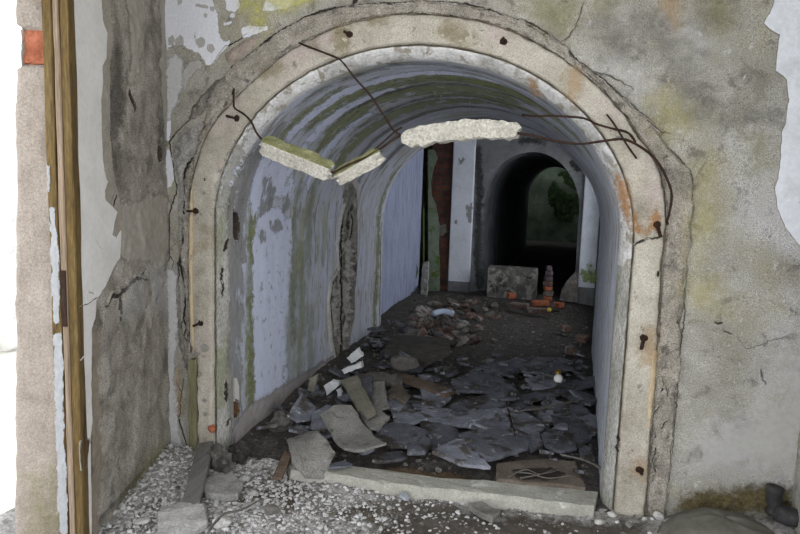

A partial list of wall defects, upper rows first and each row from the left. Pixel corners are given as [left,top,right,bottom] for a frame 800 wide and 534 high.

peeling [262,0,291,11]
peeling [155,0,268,250]
water stain [279,64,592,169]
crack [210,0,694,201]
crack [81,118,205,342]
peeling [228,145,290,444]
water stain [373,166,401,327]
water stain [473,146,485,289]
rust [616,174,661,234]
crack [633,236,660,247]
crack [722,330,799,349]